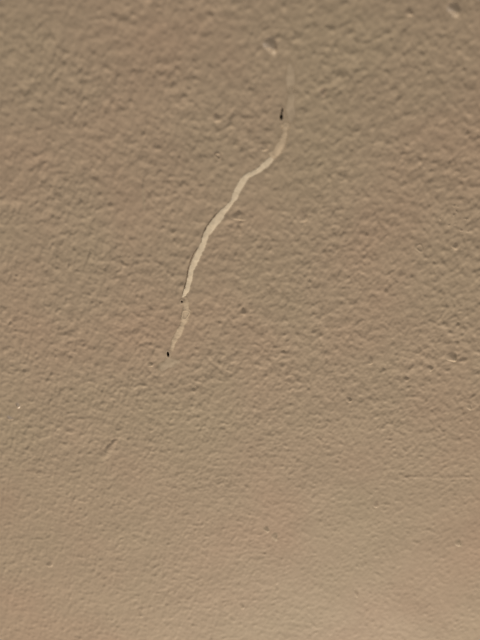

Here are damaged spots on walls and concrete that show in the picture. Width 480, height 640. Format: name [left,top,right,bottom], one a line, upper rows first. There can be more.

crack [158,61,296,371]